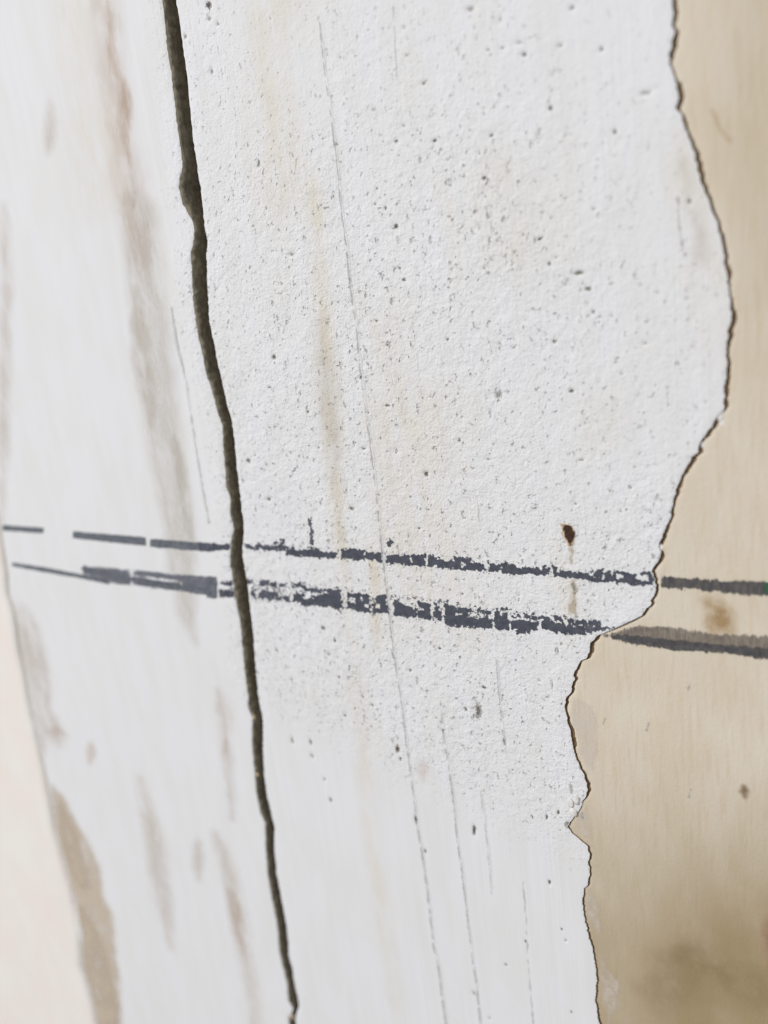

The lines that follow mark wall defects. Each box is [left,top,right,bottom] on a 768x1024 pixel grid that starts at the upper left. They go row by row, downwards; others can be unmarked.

leakage [53,790,120,1024]
crack [162,0,299,1024]
rust [560,524,575,546]
peeling [546,0,768,1024]